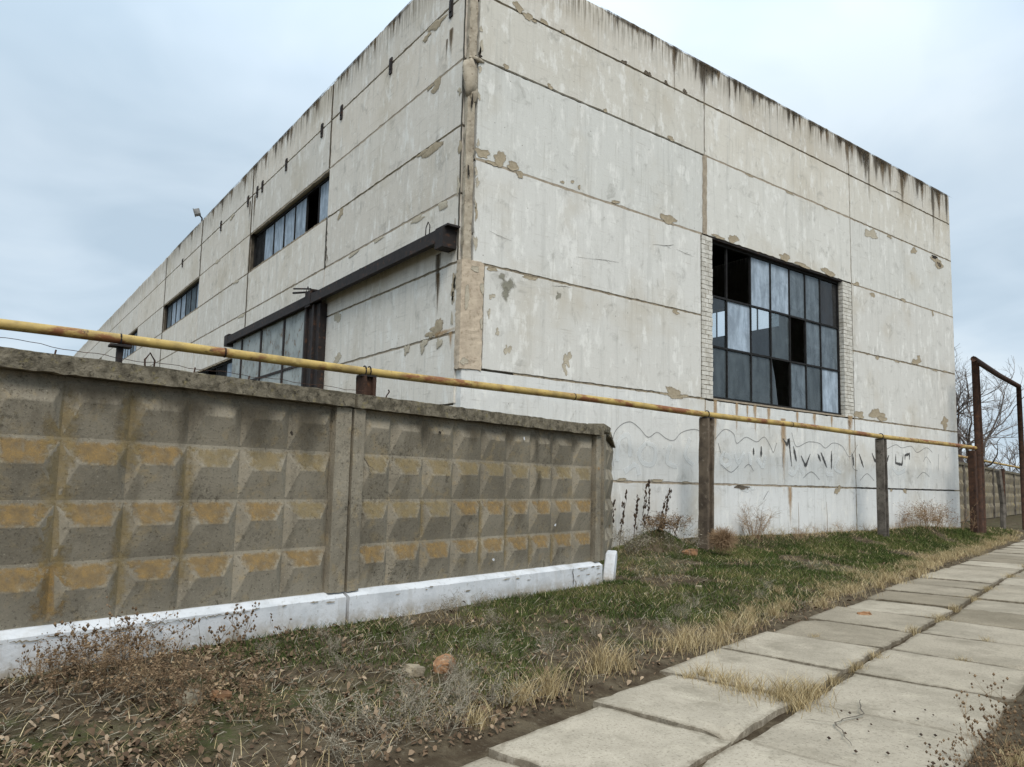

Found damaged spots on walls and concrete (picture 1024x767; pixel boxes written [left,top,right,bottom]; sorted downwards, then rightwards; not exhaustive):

spalling [512,1,548,25]
leakage [338,0,412,81]
leakage [608,10,948,215]
leakage [174,88,328,250]
spalling [417,141,443,158]
spalling [438,139,524,211]
spalling [660,213,678,225]
spalling [404,273,457,356]
spalling [562,352,572,376]
spalling [660,386,688,399]
spalling [854,409,887,421]
crack [808,699,865,745]